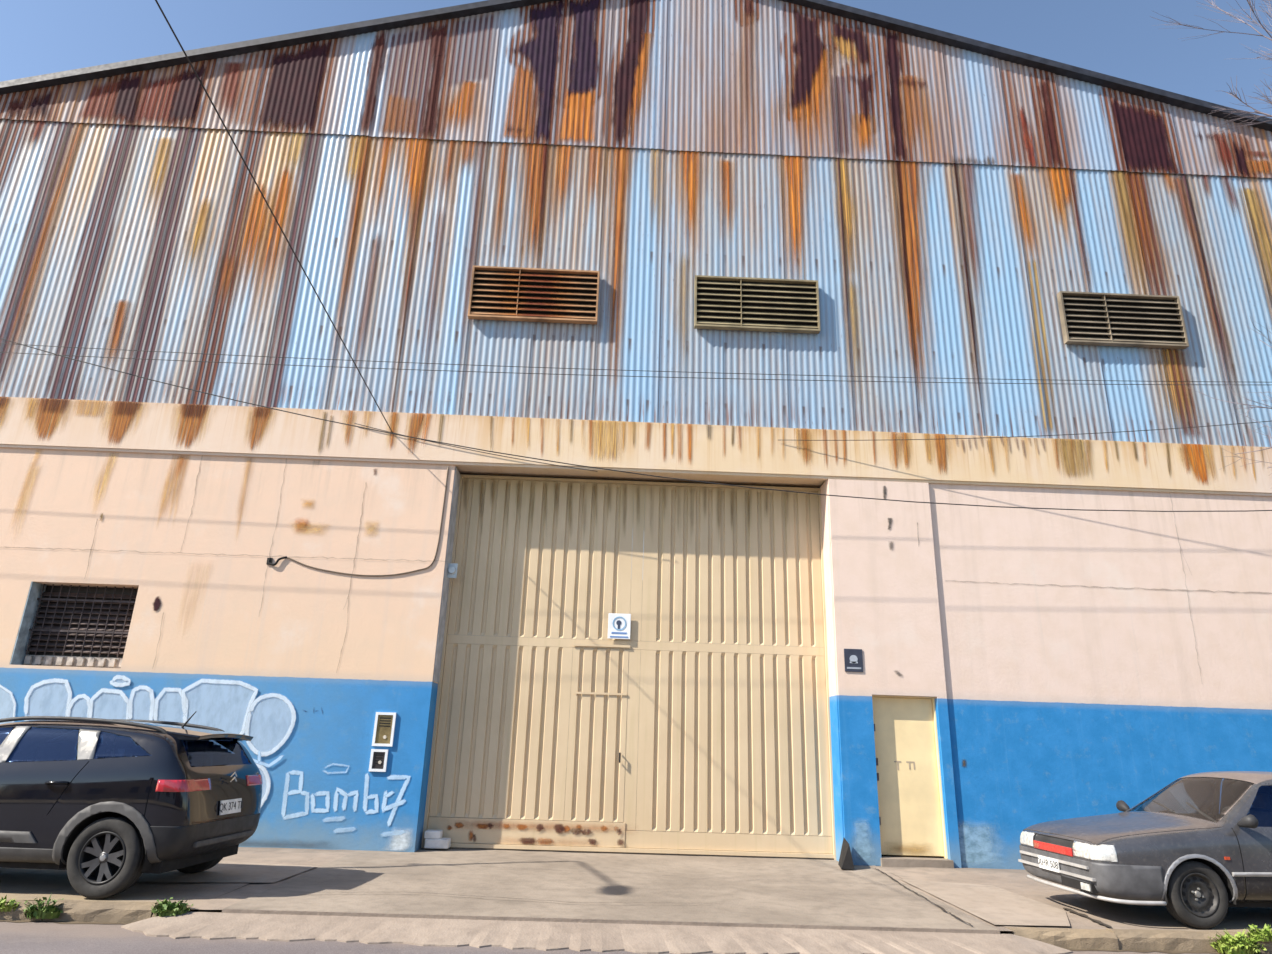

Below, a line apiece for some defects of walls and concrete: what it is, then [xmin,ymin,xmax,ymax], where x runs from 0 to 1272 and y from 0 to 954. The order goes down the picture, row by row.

rust [734,0,759,26]
rust [0,38,338,493]
rust [780,3,926,379]
rust [952,163,977,369]
rust [1001,69,1081,243]
rust [1100,87,1229,351]
rust [1194,132,1272,292]
rust [390,412,444,451]
rust [512,418,691,460]
rust [924,262,1118,476]
rust [1163,349,1264,483]
rust [448,823,623,845]